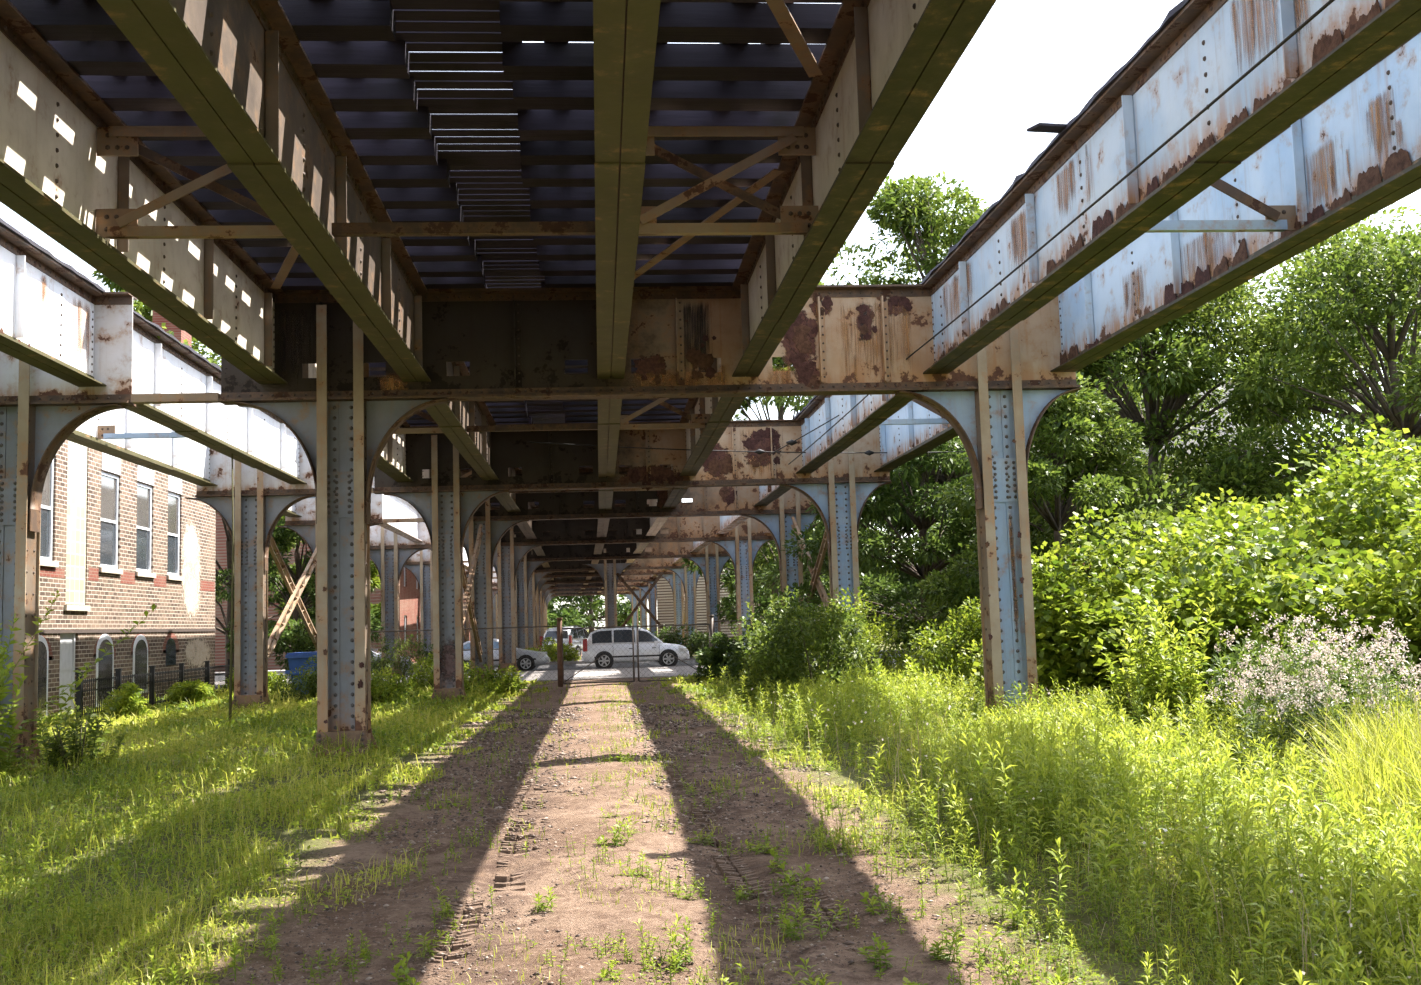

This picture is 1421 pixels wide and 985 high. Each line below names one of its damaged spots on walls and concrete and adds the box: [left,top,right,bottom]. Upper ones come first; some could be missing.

corrosion [1046,91,1278,275]
corrosion [1280,95,1412,240]
corrosion [73,301,89,355]
corrosion [1060,332,1111,365]
corrosion [1125,270,1143,314]
corrosion [1164,232,1248,306]